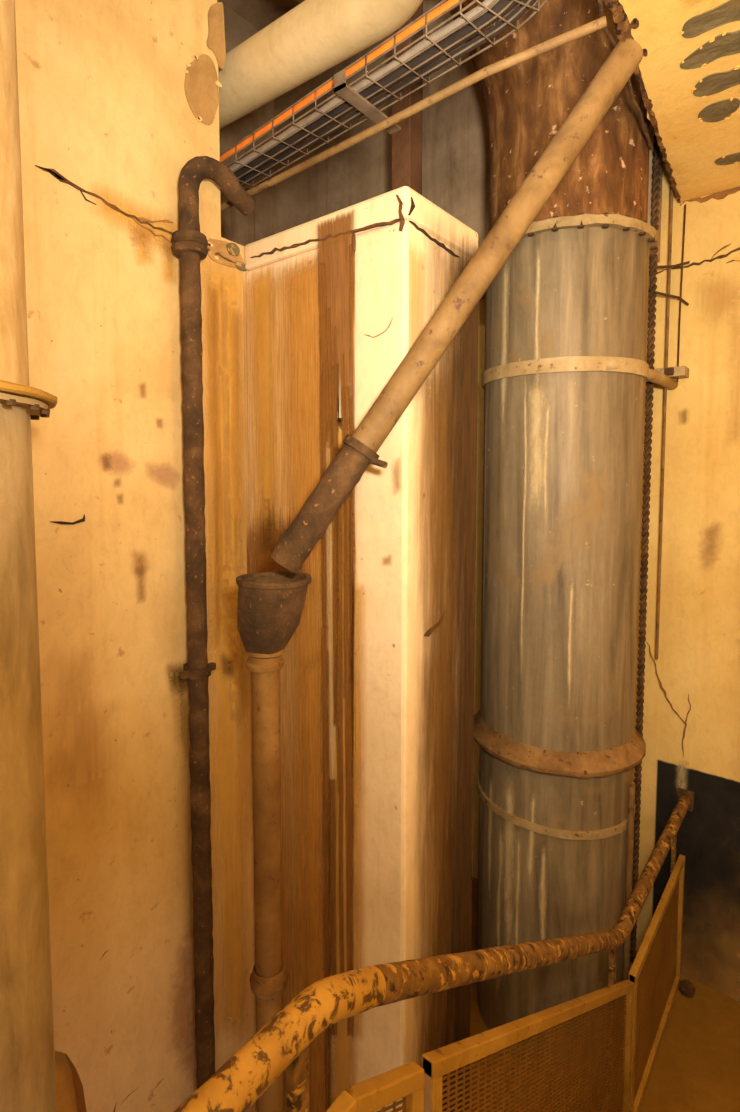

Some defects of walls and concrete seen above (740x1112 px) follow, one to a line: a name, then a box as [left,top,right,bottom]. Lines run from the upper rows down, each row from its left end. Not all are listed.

peeling [184,2,226,125]
crack [35,165,174,245]
crack [207,194,459,263]
crack [657,244,740,274]
crack [680,187,740,206]
corrosion [245,212,360,1008]
crack [646,642,691,758]
corrosion [309,1014,359,1112]